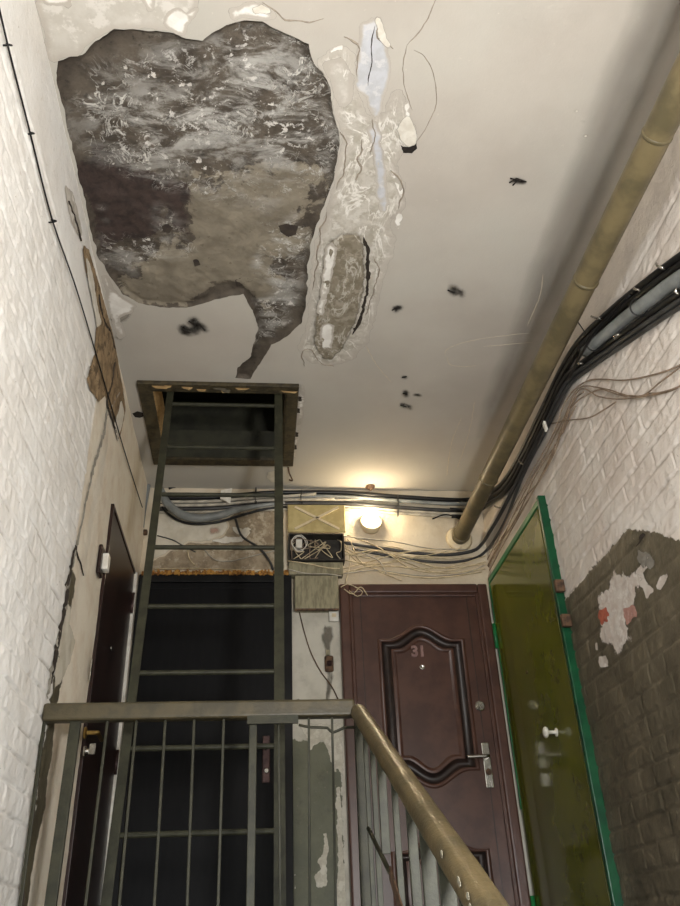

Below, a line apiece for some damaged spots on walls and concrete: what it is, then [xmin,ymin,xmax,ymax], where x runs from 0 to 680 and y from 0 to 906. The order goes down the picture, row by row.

crack [402,0,437,141]
spalling [35,0,417,441]
peeling [595,533,668,667]